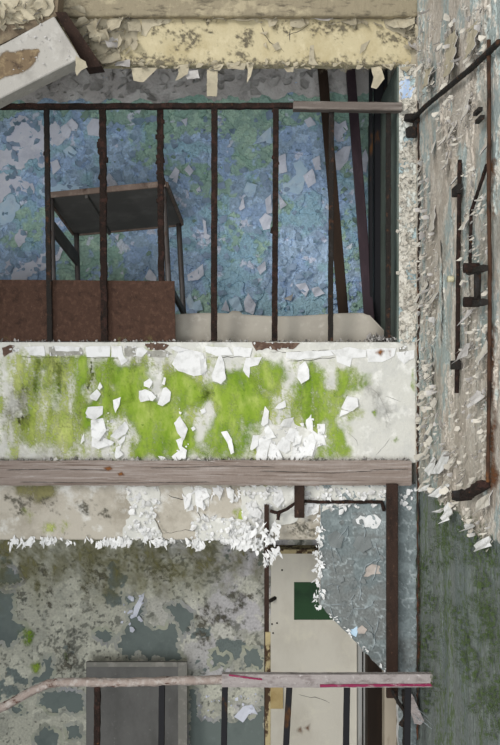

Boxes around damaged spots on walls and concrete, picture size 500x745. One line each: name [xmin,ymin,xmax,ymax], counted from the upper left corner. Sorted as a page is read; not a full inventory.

peeling [206,5,489,113]
peeling [0,0,326,283]
peeling [334,120,351,178]
peeling [429,89,477,170]
peeling [2,140,493,552]
damp [0,540,63,608]
damp [71,540,185,593]
damp [188,540,218,571]
peeling [84,485,386,610]
damp [195,592,253,646]
peeling [329,613,369,652]